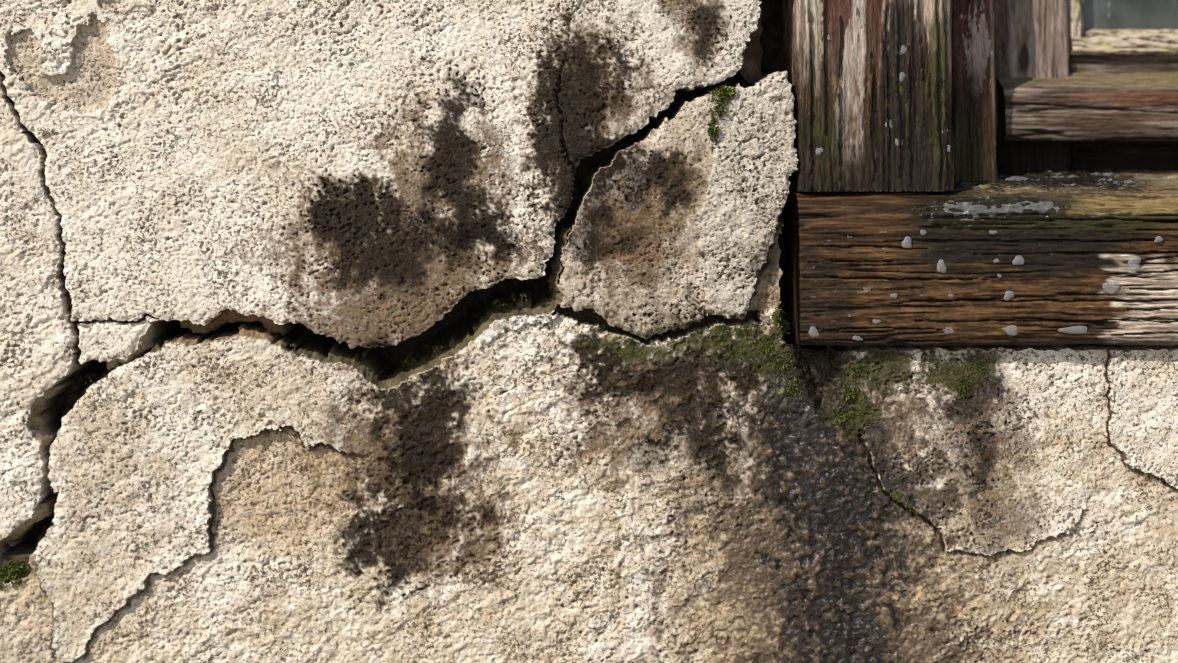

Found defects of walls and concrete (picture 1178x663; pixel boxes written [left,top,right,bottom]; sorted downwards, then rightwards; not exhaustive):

crack [0,71,763,584]
leakage [231,0,1048,663]